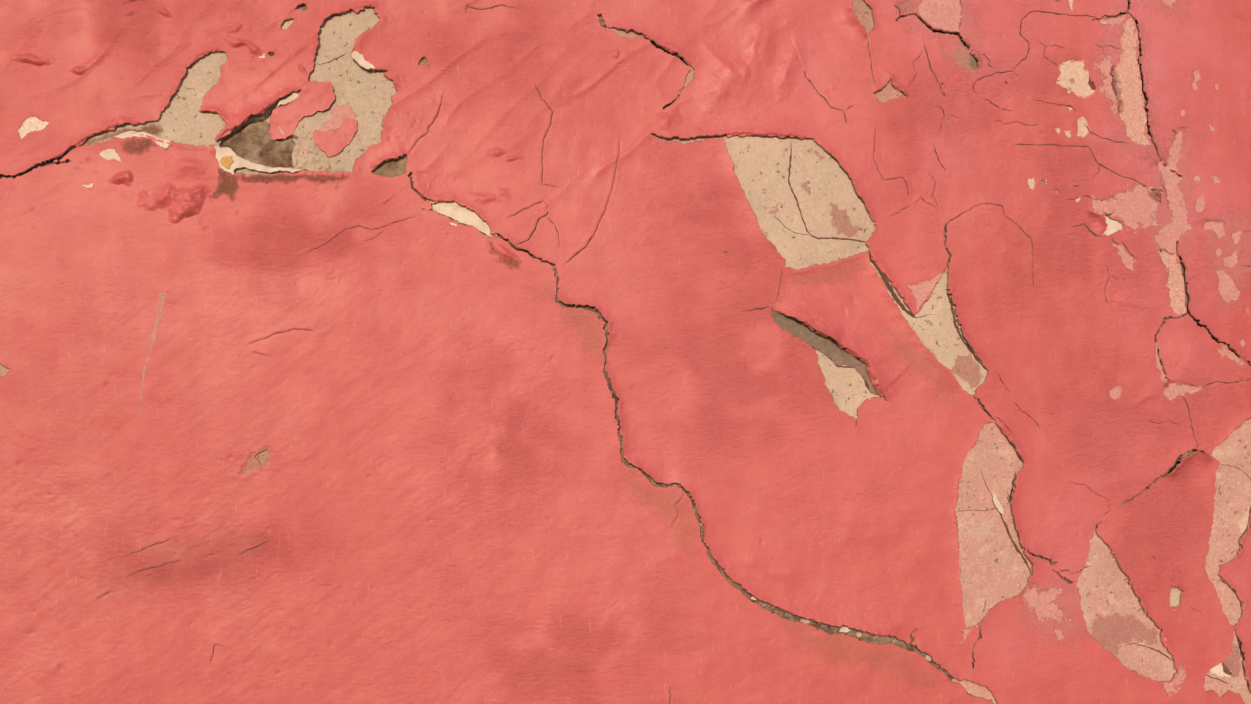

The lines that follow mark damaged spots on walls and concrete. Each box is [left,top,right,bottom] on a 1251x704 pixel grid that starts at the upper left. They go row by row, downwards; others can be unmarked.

crack [0,145,77,179]
peeling [67,3,398,176]
crack [306,95,443,254]
crack [597,13,694,110]
crack [488,85,982,684]
peeling [651,133,989,400]
peeling [771,308,888,427]
crack [804,0,1185,287]
crack [1075,241,1251,534]
peeling [955,416,1034,629]
peeling [1076,529,1177,682]
peeling [1204,419,1251,704]